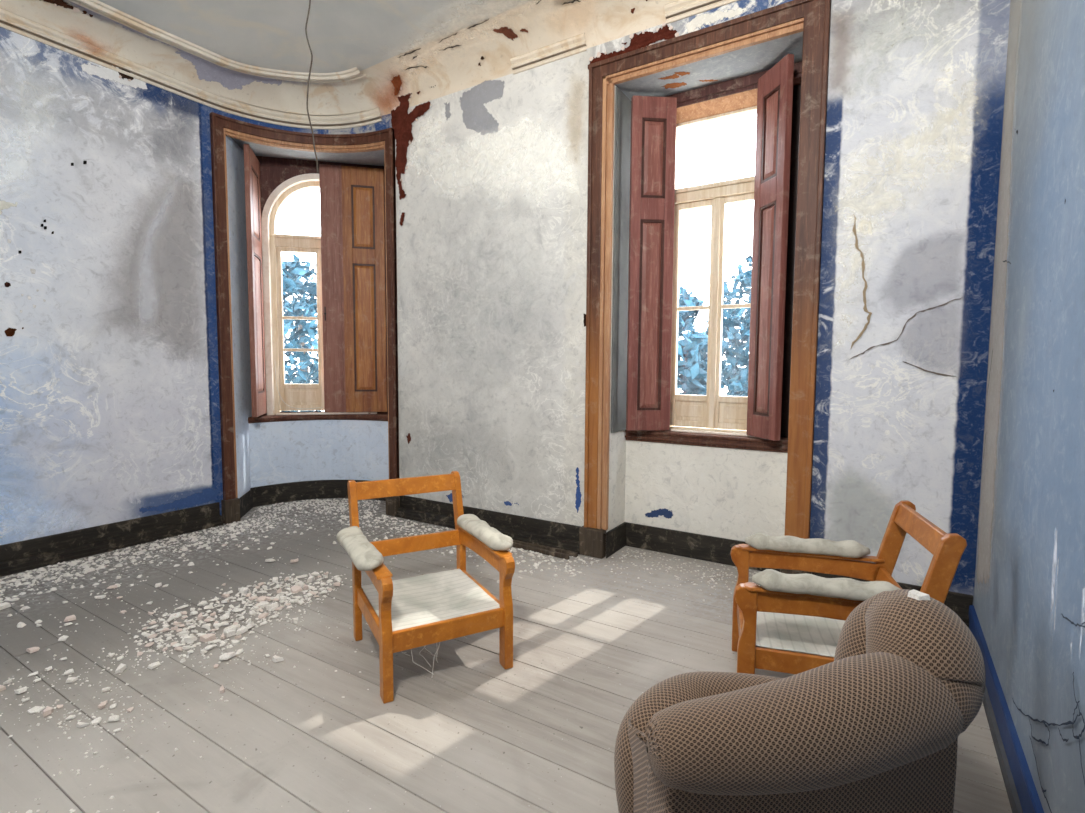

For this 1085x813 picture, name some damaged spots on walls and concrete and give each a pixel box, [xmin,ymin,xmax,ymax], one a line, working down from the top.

peeling [44,0,282,90]
crack [397,19,489,70]
spalling [493,27,528,40]
spalling [589,8,746,64]
peeling [391,75,504,226]
crack [850,296,963,376]
crack [1012,672,1085,813]